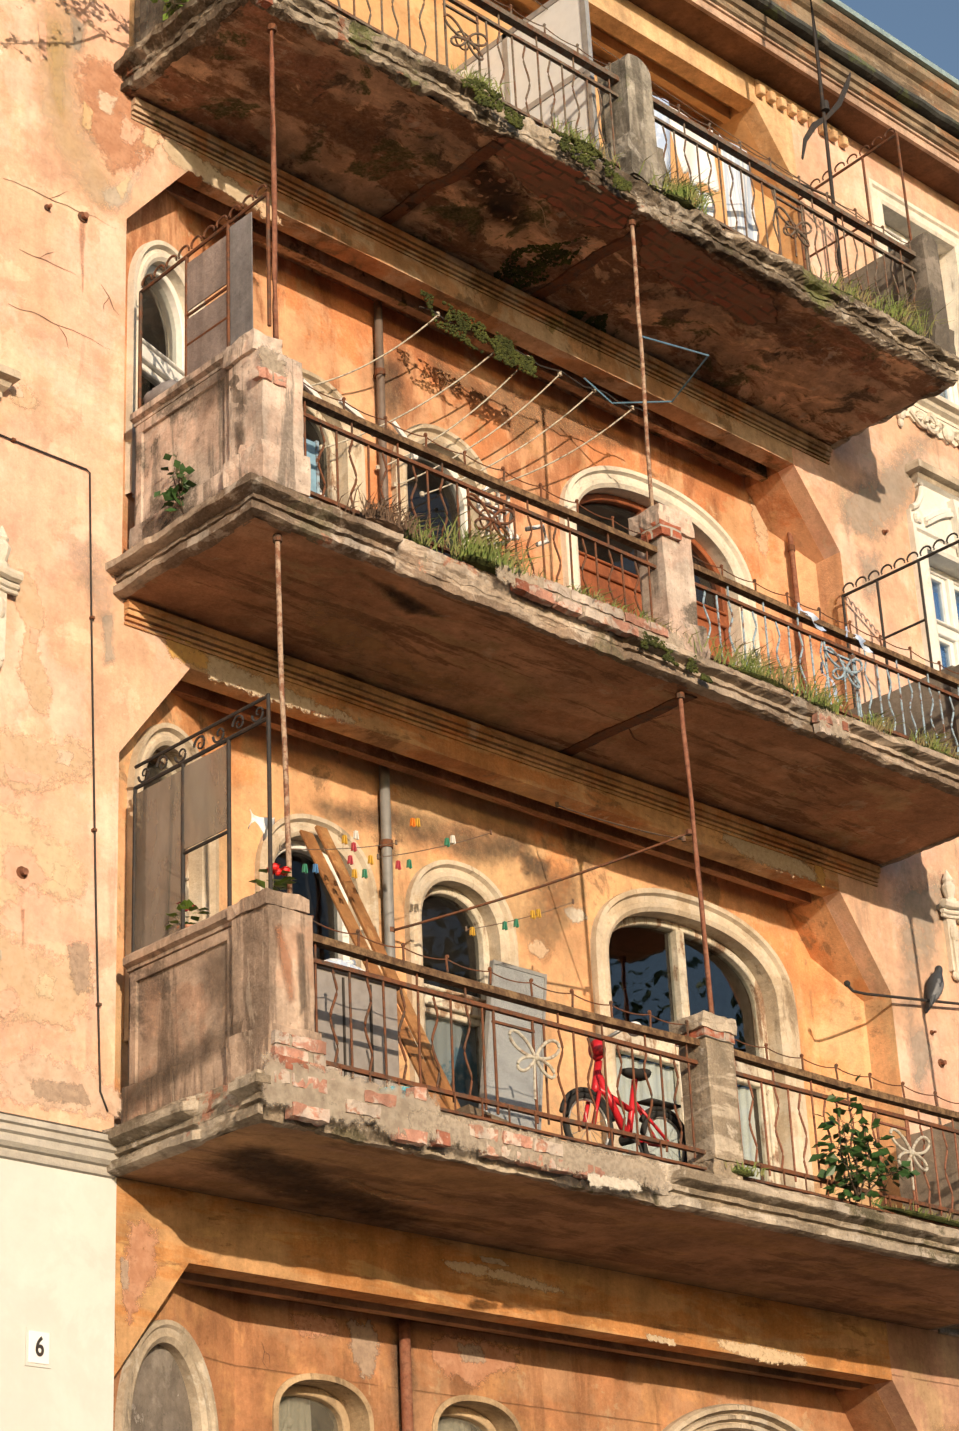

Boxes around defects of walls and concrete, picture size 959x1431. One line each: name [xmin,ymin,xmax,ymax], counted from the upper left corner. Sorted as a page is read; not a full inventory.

peeling [74,55,281,224]
water stain [469,162,527,226]
water stain [436,363,620,445]
peeling [11,569,52,714]
flaking render [496,561,685,655]
flaking render [262,1029,667,1191]
water stain [214,1149,425,1224]
peeling [120,1220,159,1325]
peeling [442,1256,564,1293]
peeling [290,1313,380,1379]
peeling [429,1334,521,1389]